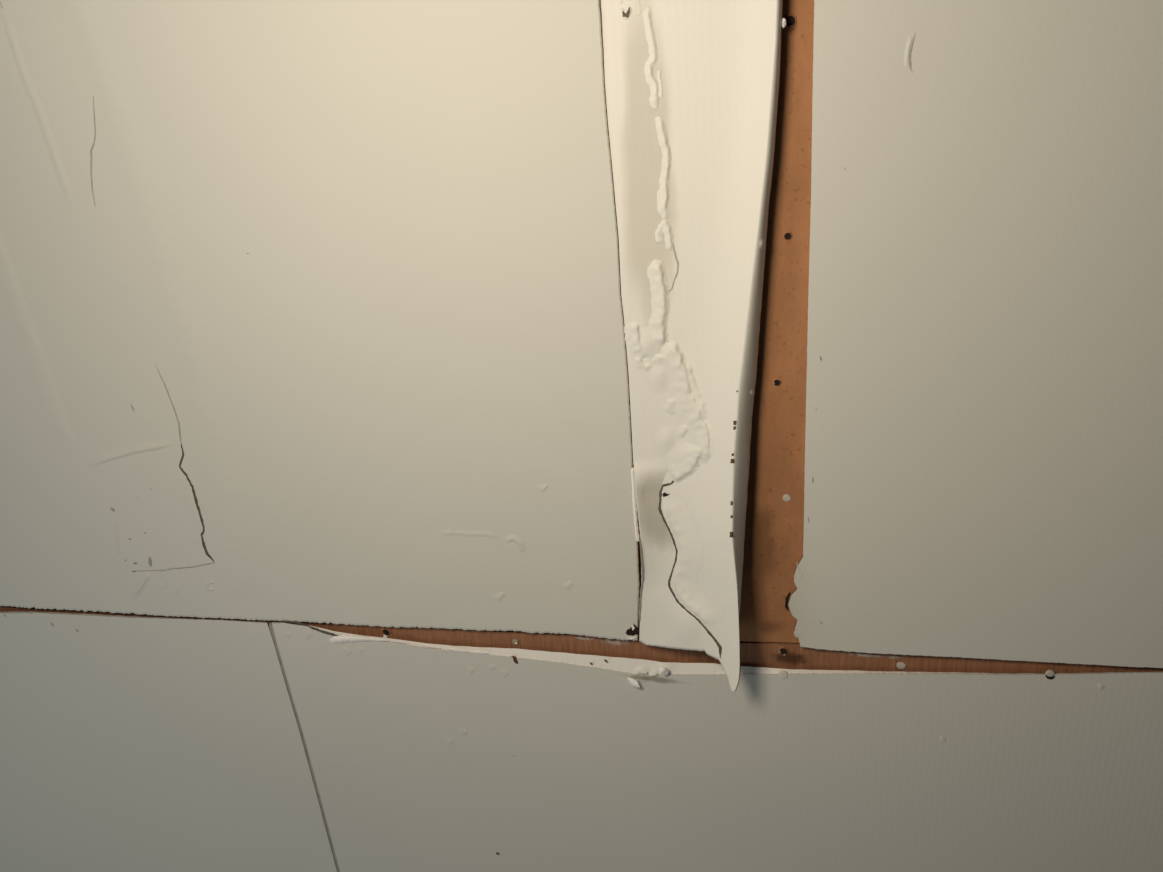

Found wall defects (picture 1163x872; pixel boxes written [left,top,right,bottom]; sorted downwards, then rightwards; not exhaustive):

peeling [600,0,783,693]
crack [134,365,215,572]
peeling [329,635,405,643]
peeling [421,645,489,654]